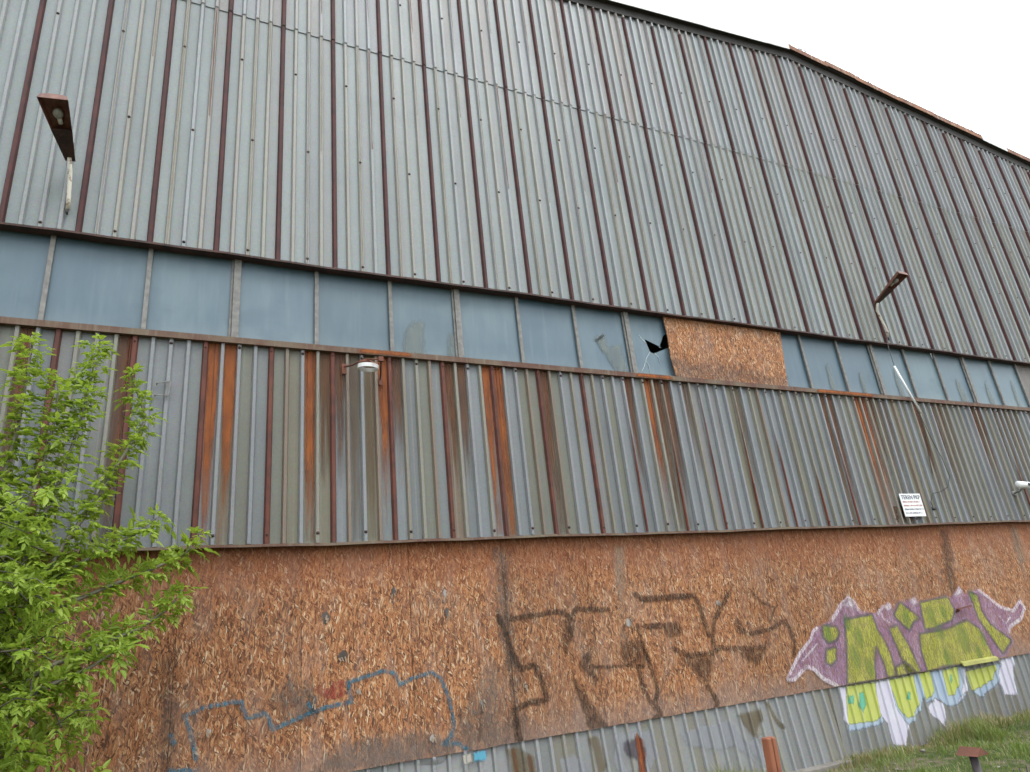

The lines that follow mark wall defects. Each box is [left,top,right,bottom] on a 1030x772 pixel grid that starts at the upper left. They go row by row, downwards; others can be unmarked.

rust [201,343,237,535]
rust [305,349,411,506]
rust [444,363,468,463]
rust [481,366,515,532]
rust [540,371,561,518]
rust [624,373,696,506]
rust [817,389,913,524]
rust [912,402,942,494]
rust [970,407,1030,476]